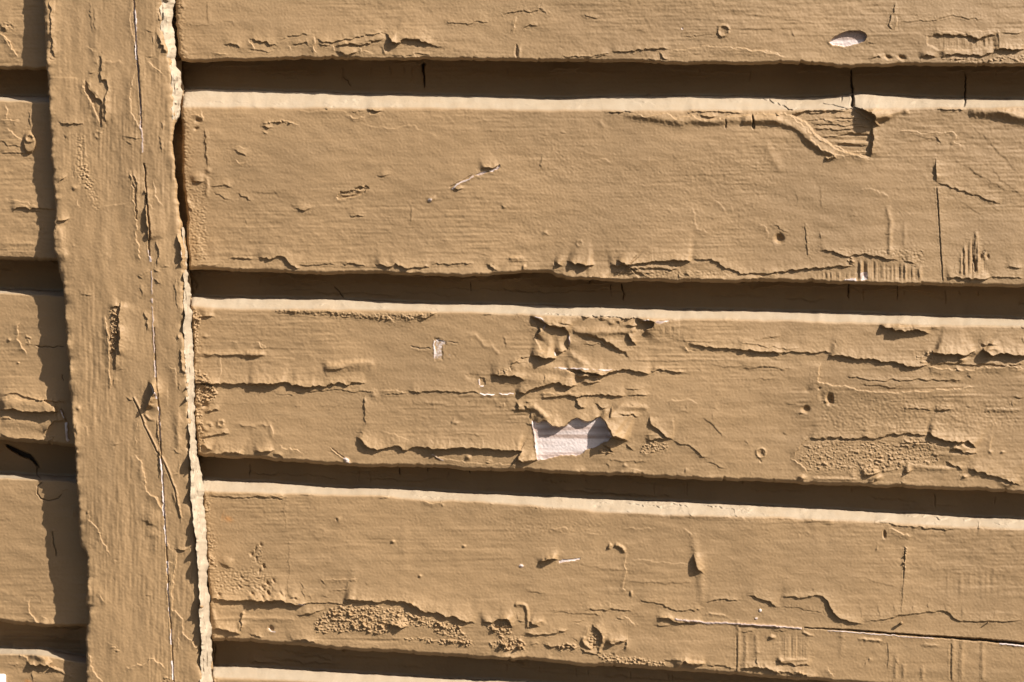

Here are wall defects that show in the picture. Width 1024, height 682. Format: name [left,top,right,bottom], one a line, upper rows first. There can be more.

peeling [828,27,1024,64]
peeling [604,93,894,163]
crack [897,72,1004,283]
crack [131,0,342,682]
peeling [228,244,929,389]
peeling [789,316,1024,489]
spalling [205,488,288,516]
peeling [207,531,583,671]
spalling [597,635,734,674]
crack [550,544,1024,682]